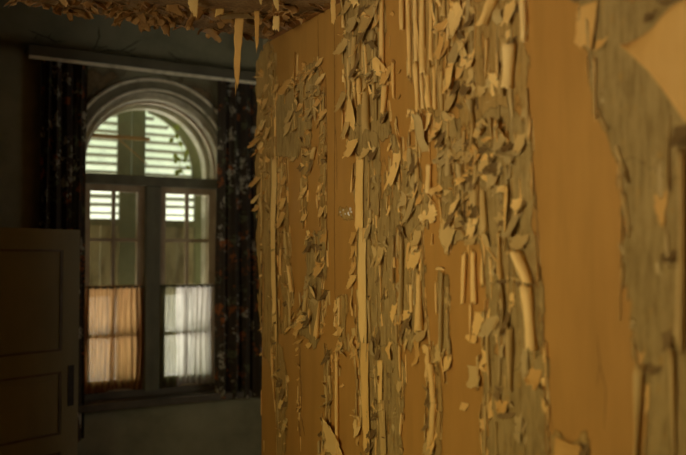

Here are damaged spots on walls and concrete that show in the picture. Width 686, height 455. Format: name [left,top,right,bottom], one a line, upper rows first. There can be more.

peeling [4,0,336,455]
peeling [317,0,590,455]
peeling [571,0,686,455]